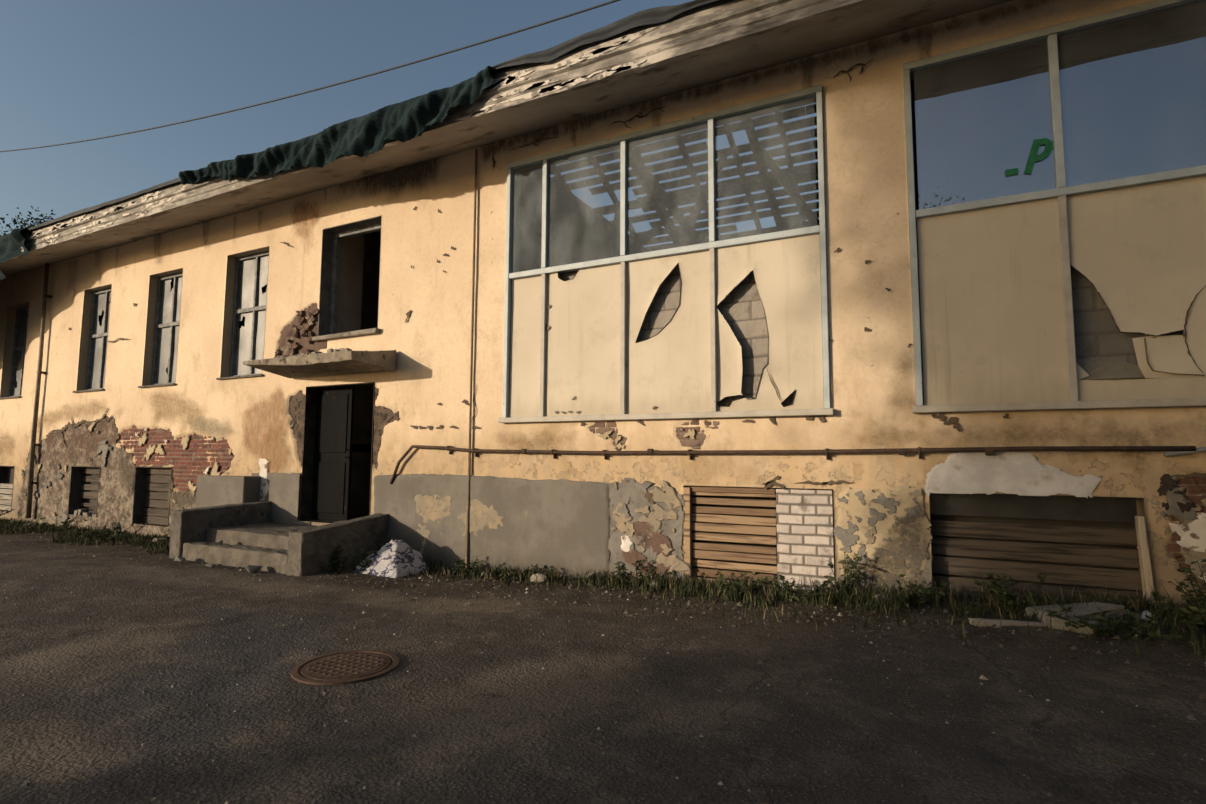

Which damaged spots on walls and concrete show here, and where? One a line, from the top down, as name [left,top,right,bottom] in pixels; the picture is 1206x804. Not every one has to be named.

peeling [457,27,658,120]
peeling [21,191,173,248]
peeling [274,309,322,358]
spalling [635,263,681,343]
spalling [717,270,768,407]
spalling [1070,265,1204,379]
flaking render [17,416,234,535]
flaking render [676,418,720,449]
flaking render [611,480,691,575]
flaking render [1157,474,1206,587]